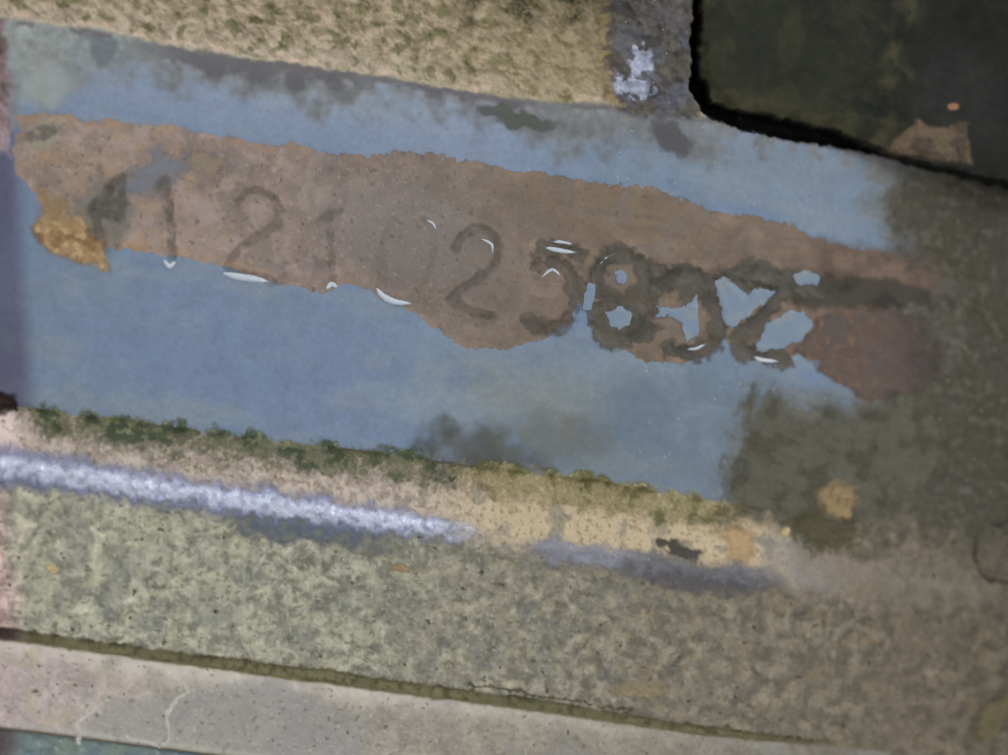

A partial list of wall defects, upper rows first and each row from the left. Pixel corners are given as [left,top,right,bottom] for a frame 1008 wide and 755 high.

efflorescence [612,41,657,100]
peeling [12,112,969,394]
crack [972,541,1008,584]